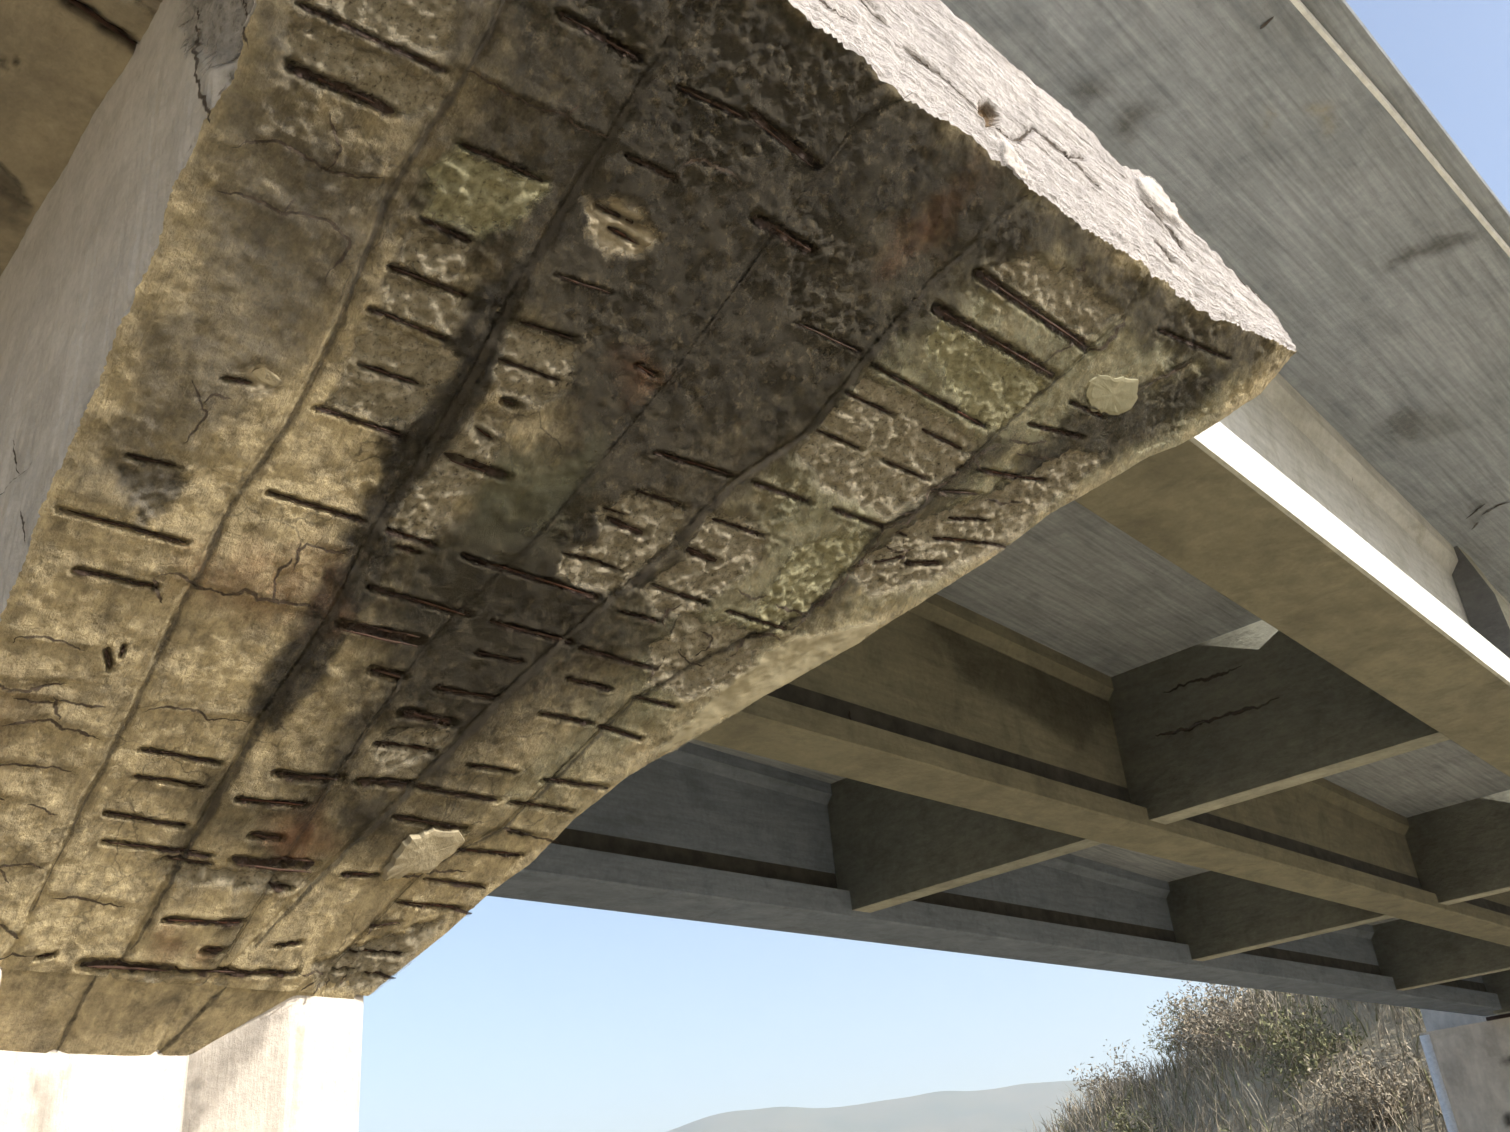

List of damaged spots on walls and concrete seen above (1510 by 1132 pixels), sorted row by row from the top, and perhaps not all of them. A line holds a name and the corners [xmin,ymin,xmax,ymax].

crack [191,8,383,179]
spalling [977,106,1028,178]
spalling [585,196,656,255]
leakage [121,108,347,454]
leakage [232,0,1269,863]
crack [152,543,345,616]
crack [0,683,106,816]
crack [145,706,246,722]
crack [0,863,124,907]
peeling [341,814,528,889]
crack [0,924,31,960]
spalling [80,901,472,988]